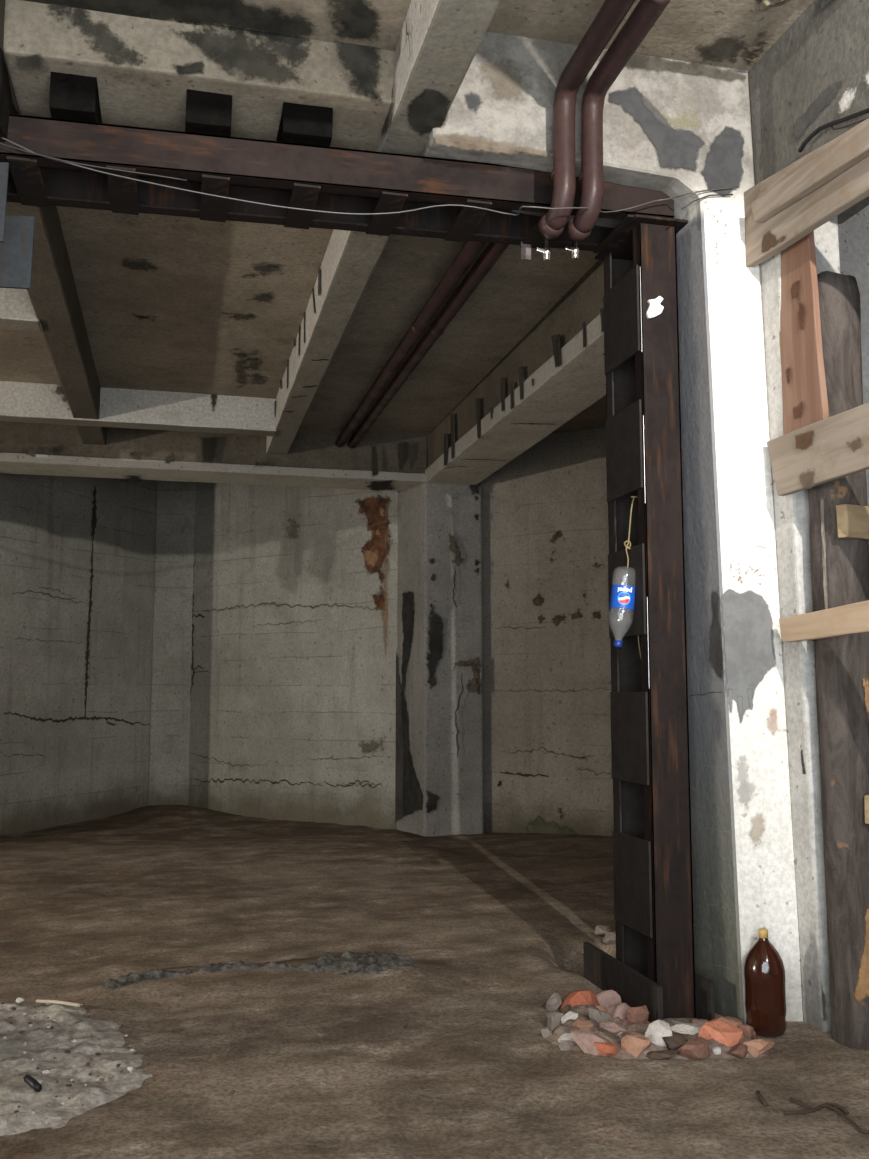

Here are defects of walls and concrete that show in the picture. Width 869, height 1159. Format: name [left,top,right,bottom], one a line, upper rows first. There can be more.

water stain [17,54,47,72]
water stain [22,0,314,82]
water stain [329,0,394,135]
spalling [741,32,768,65]
spalling [756,0,790,11]
water stain [407,89,551,157]
crack [12,584,86,603]
crack [190,563,382,701]
corrosion [355,495,391,655]
water stain [426,603,444,689]
water stain [358,591,439,823]
crack [194,754,384,788]